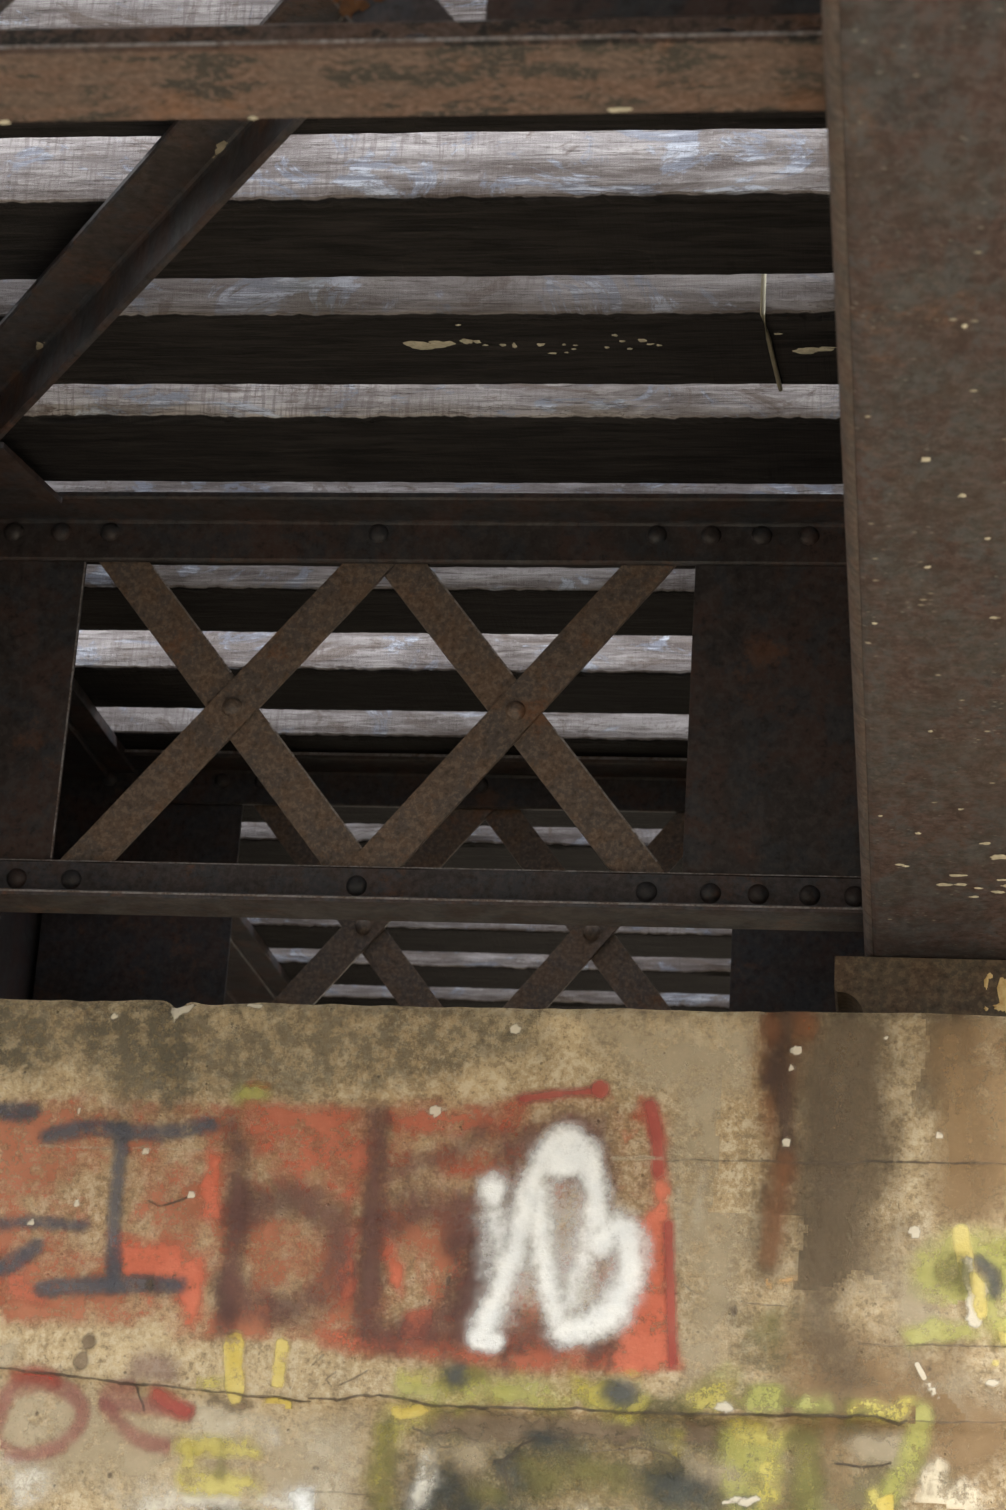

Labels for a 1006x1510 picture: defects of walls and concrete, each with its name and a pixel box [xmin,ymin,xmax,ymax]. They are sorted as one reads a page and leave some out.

corrosion [762,1011,816,1288]
leakage [742,1013,1006,1510]
crack [0,1354,993,1498]
leakage [508,1408,750,1510]